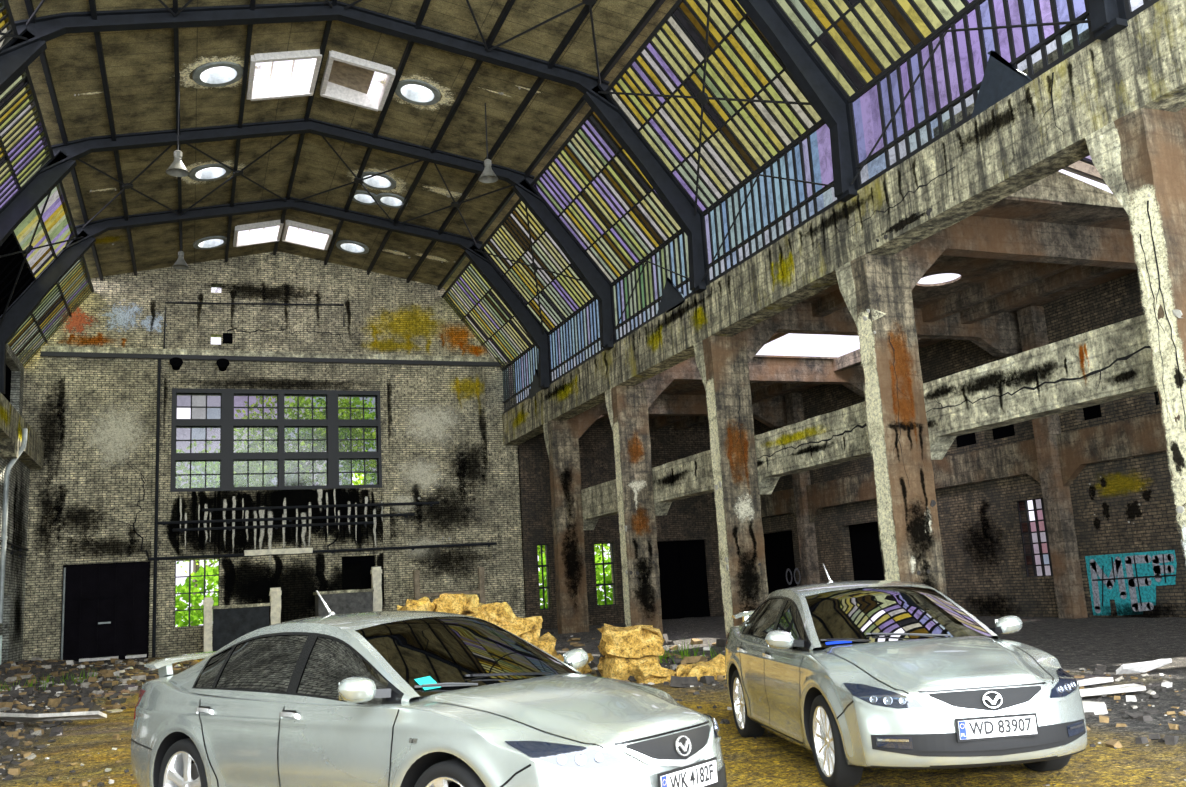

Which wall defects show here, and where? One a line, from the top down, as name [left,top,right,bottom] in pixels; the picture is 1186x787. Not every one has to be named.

leakage [957,86,1035,155]
leakage [769,160,918,283]
leakage [197,283,325,332]
crack [889,200,1186,482]
crack [734,395,867,472]
leakage [980,500,989,538]